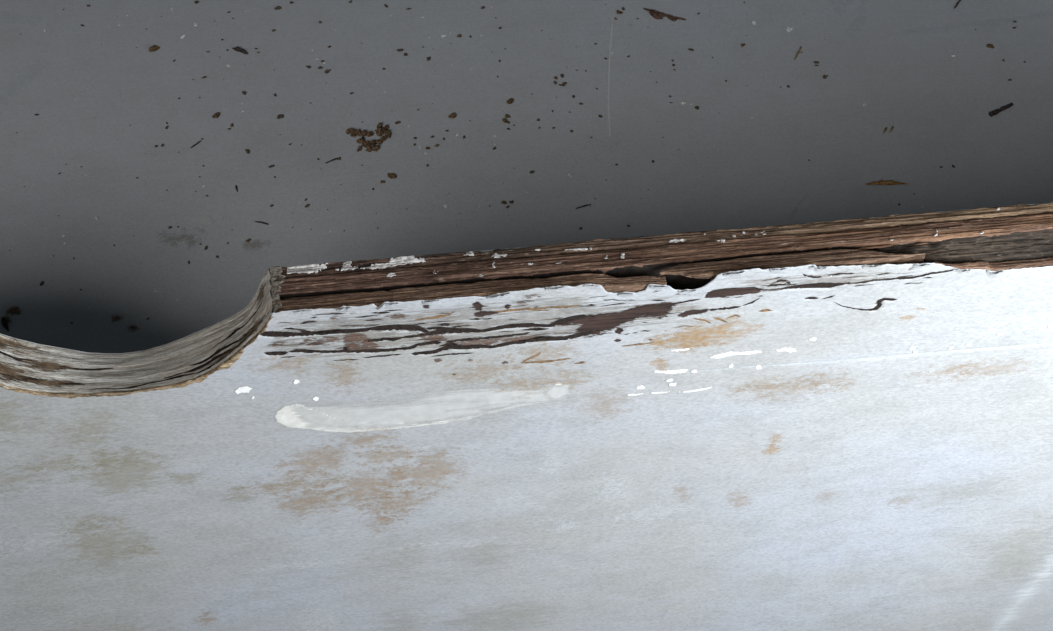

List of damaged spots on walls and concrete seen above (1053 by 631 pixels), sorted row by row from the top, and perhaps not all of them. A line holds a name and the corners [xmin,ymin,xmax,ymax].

peeling [377,303,411,319]
peeling [472,287,566,317]
peeling [551,271,764,342]
peeling [299,332,379,351]